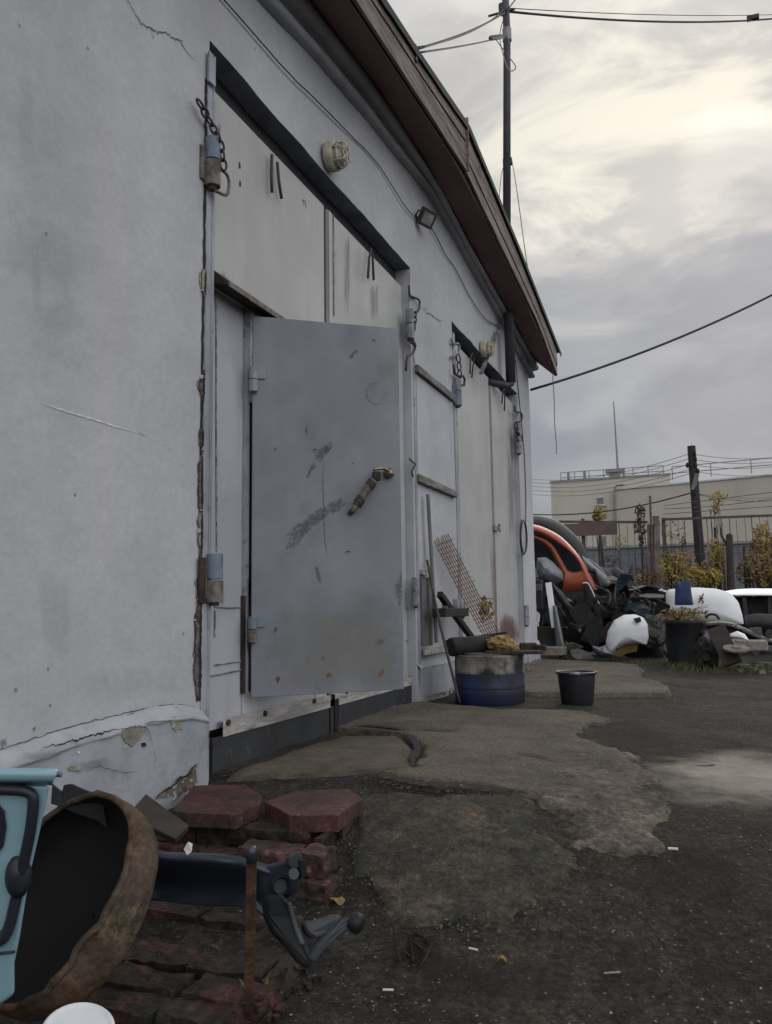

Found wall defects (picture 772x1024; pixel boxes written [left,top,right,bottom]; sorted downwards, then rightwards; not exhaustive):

crack [128,1,208,146]
crack [199,185,207,375]
flaking render [197,369,206,402]
crack [197,401,205,456]
peeling [287,499,342,548]
flaking render [193,428,205,703]
crack [0,704,194,773]
flaking render [121,725,146,748]
flaking render [155,764,198,800]